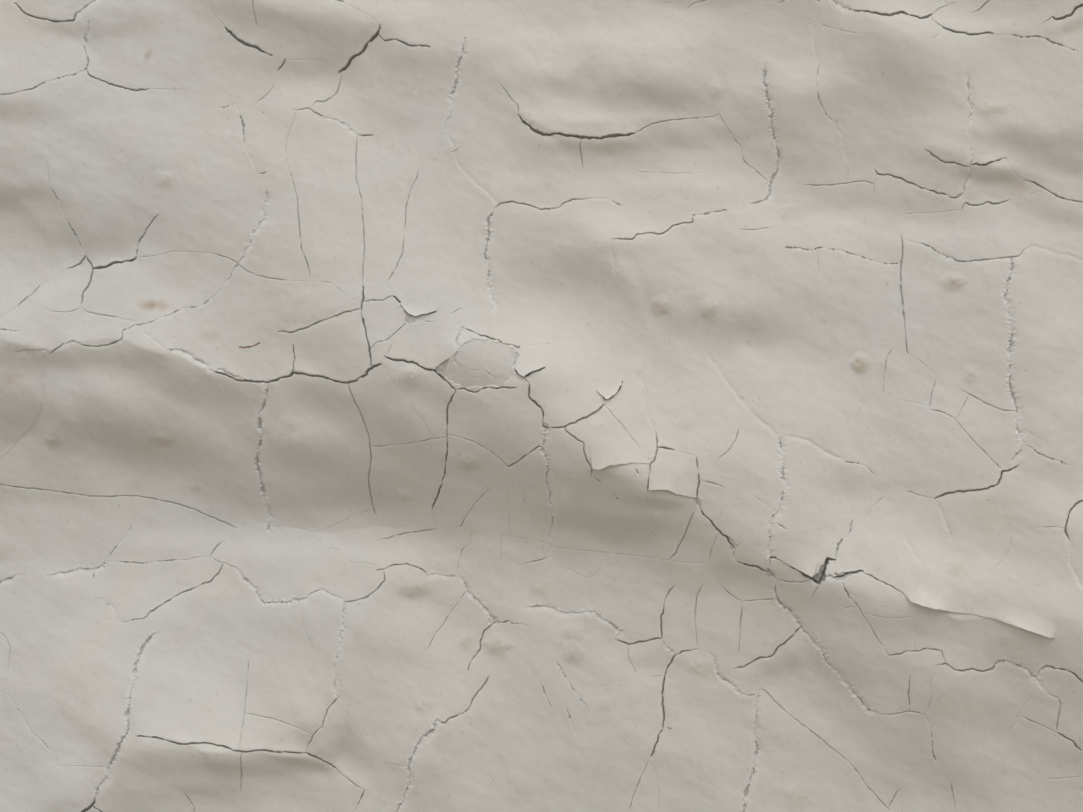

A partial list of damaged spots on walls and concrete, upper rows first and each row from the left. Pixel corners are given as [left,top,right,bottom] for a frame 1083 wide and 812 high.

crack [770,0,1083,58]
crack [0,0,727,569]
crack [494,54,1083,551]
peeling [590,444,703,510]
crack [0,567,26,591]
peeling [763,537,854,587]
peeling [902,569,1058,639]
crack [40,493,1083,812]